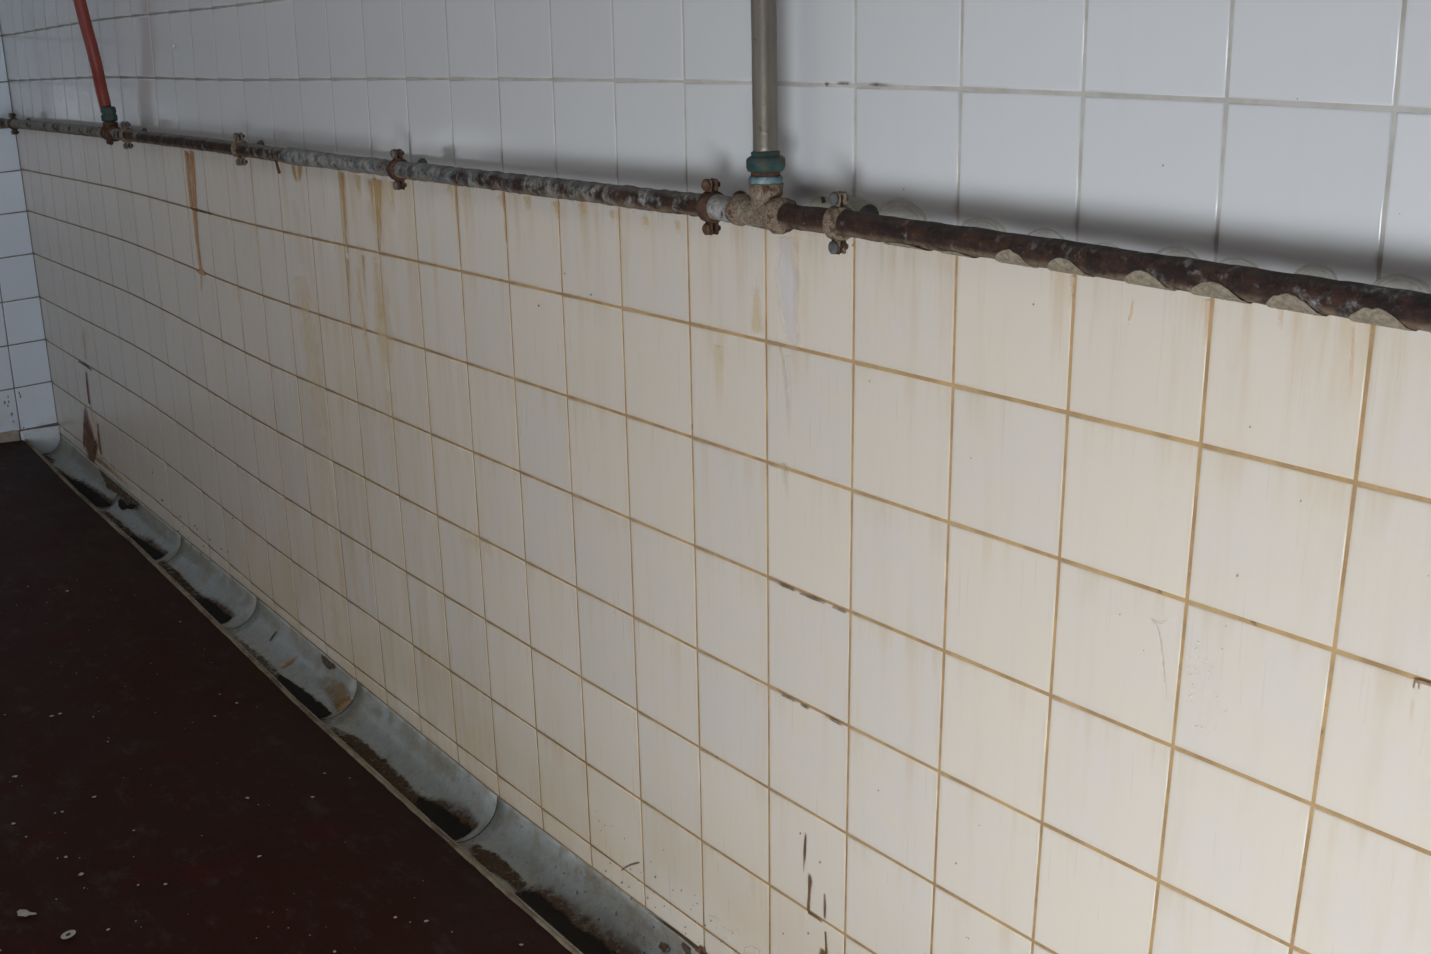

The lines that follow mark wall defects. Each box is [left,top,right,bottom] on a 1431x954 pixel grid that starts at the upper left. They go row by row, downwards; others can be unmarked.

corrosion [184,150,211,276]
corrosion [340,172,381,245]
corrosion [78,339,116,476]
corrosion [803,835,827,954]